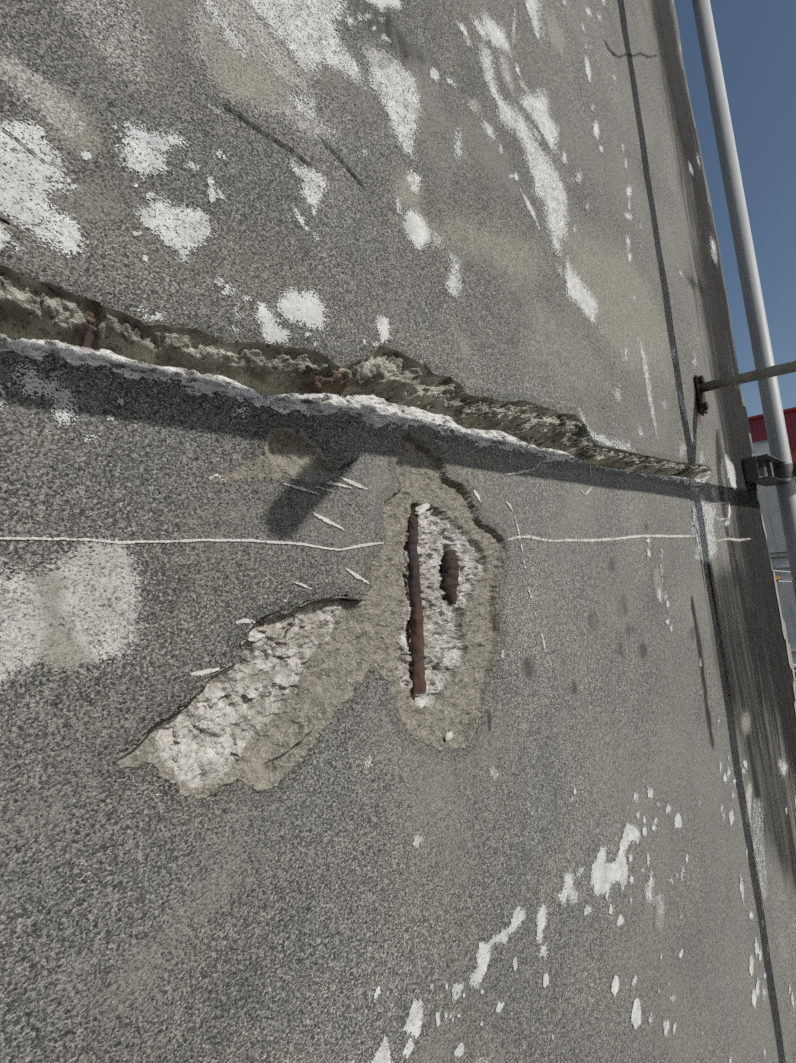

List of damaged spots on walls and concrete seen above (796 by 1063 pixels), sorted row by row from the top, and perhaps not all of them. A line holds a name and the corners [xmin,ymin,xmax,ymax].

leakage [0,55,103,155]
leakage [59,0,156,92]
leakage [185,1,339,150]
leakage [366,0,421,62]
crack [0,248,713,492]
leakage [427,208,680,408]